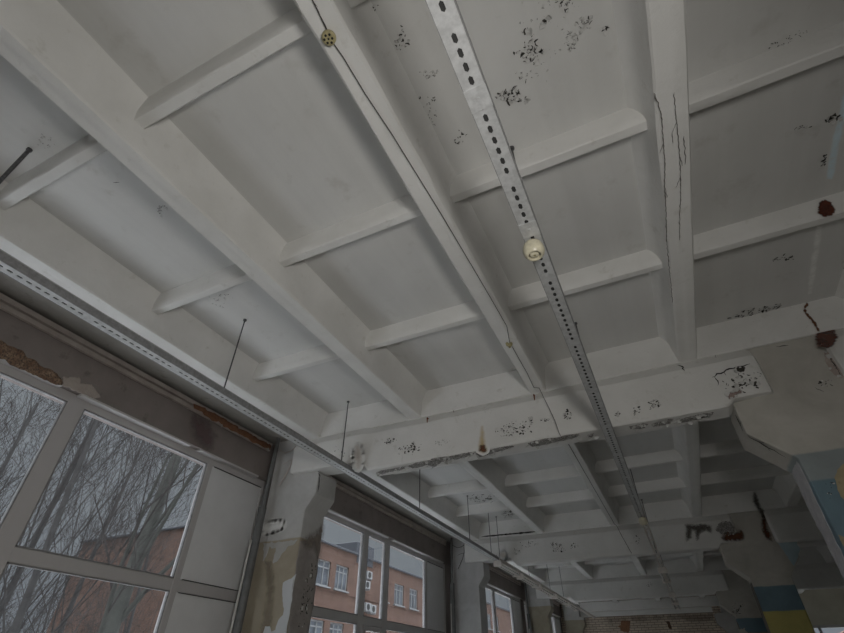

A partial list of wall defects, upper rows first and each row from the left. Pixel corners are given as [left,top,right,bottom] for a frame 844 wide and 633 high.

peeling [496,0,575,106]
crack [654,93,686,303]
rust [818,200,835,217]
rust [803,303,838,348]
flaking render [0,340,63,385]
spalling [629,399,714,432]
rust [475,424,490,456]
spalling [376,416,600,476]
rust [762,516,772,540]
peeling [792,461,844,579]
peeling [263,538,321,633]